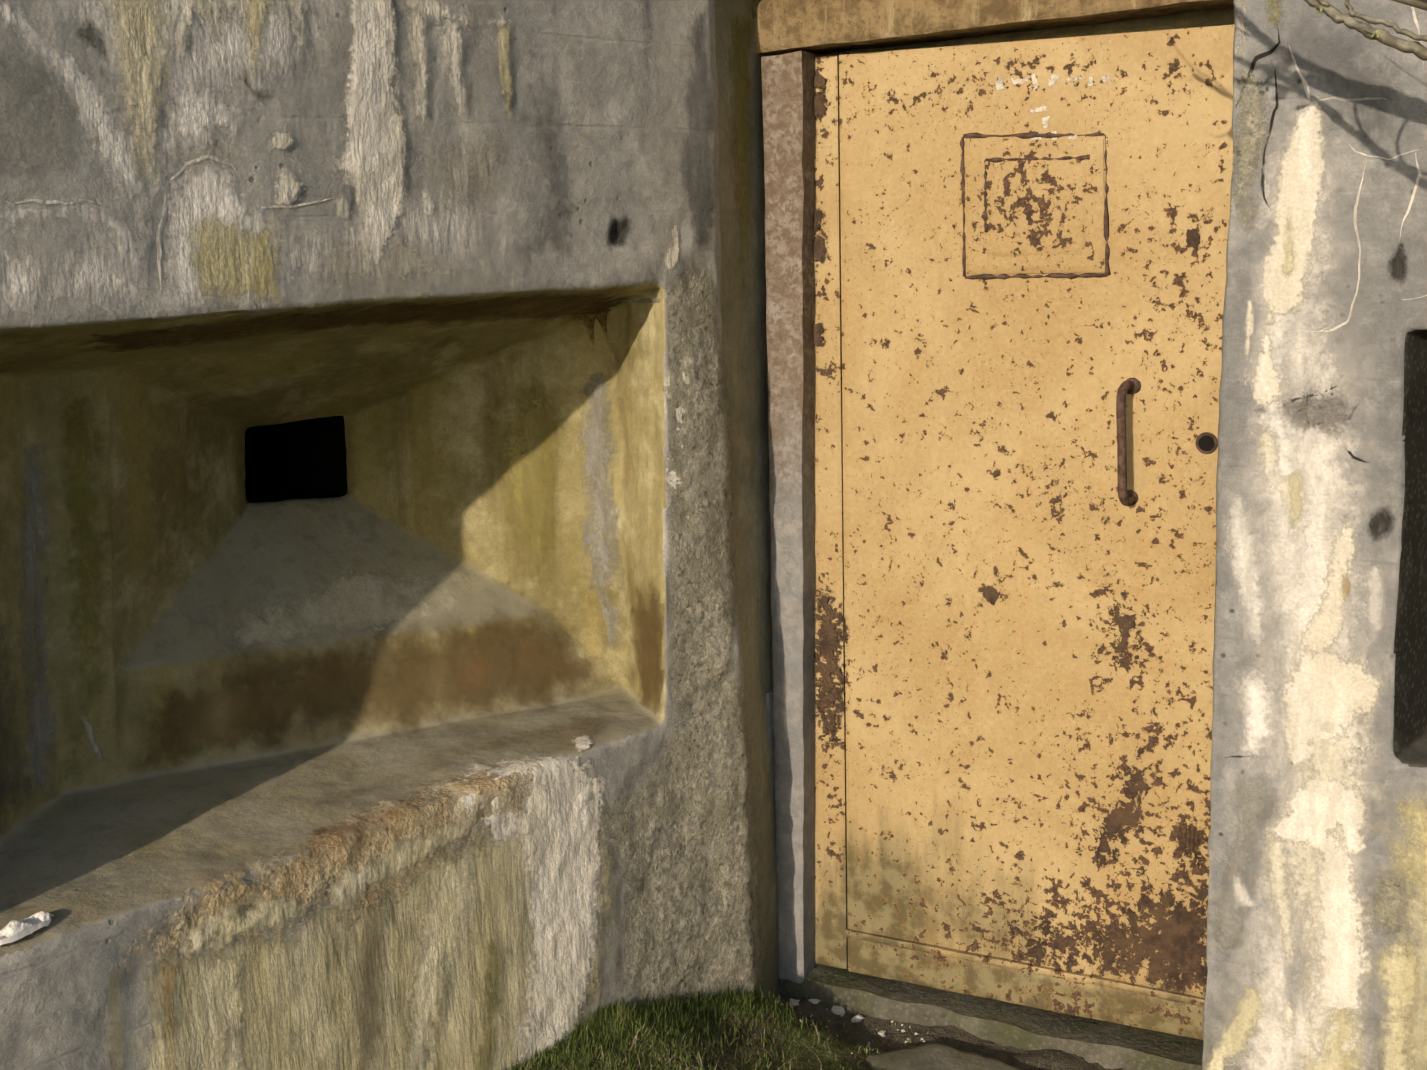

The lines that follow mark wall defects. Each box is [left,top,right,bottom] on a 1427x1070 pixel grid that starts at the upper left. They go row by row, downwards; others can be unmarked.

leakage [0,0,512,313]
rust [813,75,827,117]
rust [1185,228,1203,250]
crack [1236,25,1281,210]
crack [1301,139,1421,332]
leakage [583,380,618,645]
rust [813,586,851,750]
rust [981,585,1002,605]
rust [1109,599,1146,676]
rust [1089,747,1157,868]
leakage [124,753,609,1070]
rust [1001,822,1209,1007]